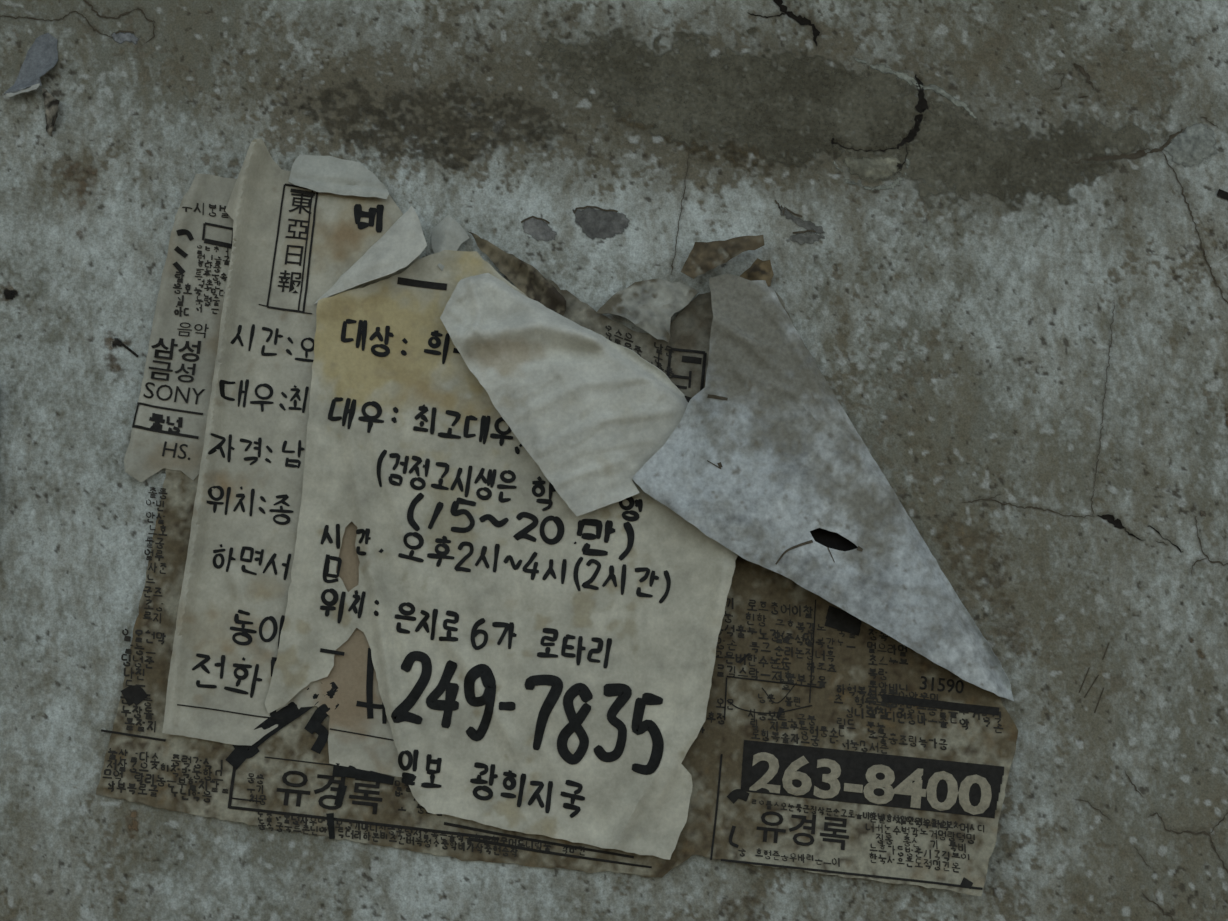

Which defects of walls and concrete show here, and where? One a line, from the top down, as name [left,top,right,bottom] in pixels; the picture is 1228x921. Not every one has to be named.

peeling [4,33,60,136]
crack [831,74,929,175]
crack [1071,117,1228,303]
crack [962,494,1094,518]
crack [1191,516,1228,574]
crack [1125,771,1228,873]
crack [1138,853,1173,921]